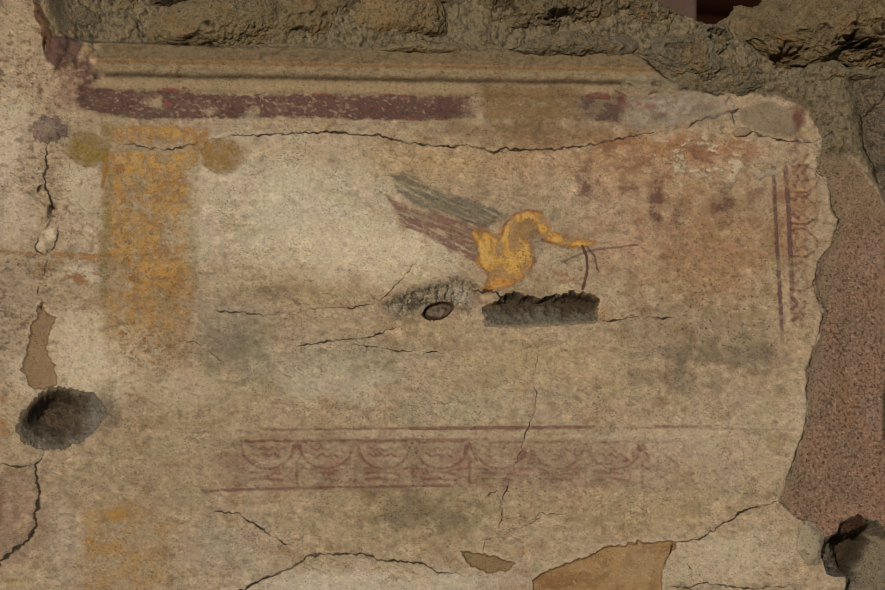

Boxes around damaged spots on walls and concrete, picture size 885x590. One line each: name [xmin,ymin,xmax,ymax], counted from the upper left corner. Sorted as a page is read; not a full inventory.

crack [232,130,658,153]
crack [34,146,59,294]
spalling [382,280,475,316]
spalling [20,305,57,390]
crack [0,459,41,565]
crack [215,511,456,590]
spalling [461,551,515,573]
spalling [532,540,676,590]